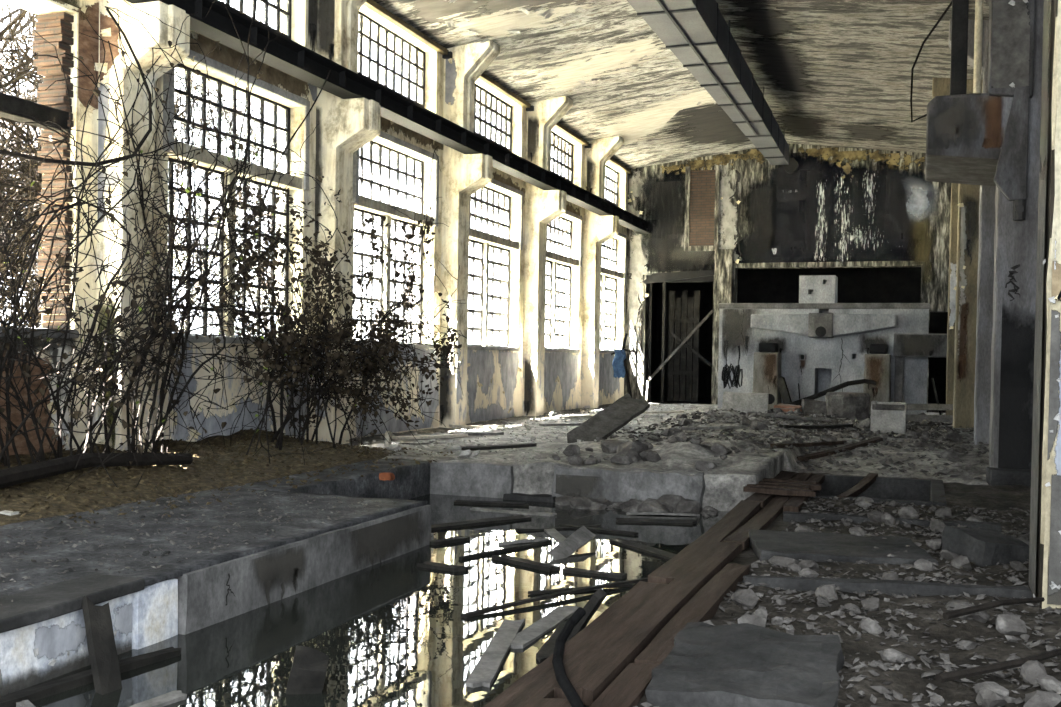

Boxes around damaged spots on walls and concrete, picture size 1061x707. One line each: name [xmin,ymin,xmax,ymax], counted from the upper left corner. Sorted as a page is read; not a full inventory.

peeling [436,0,605,44]
peeling [445,58,457,105]
peeling [519,34,667,92]
peeling [380,116,443,151]
peeling [590,85,717,145]
damp [524,359,534,416]